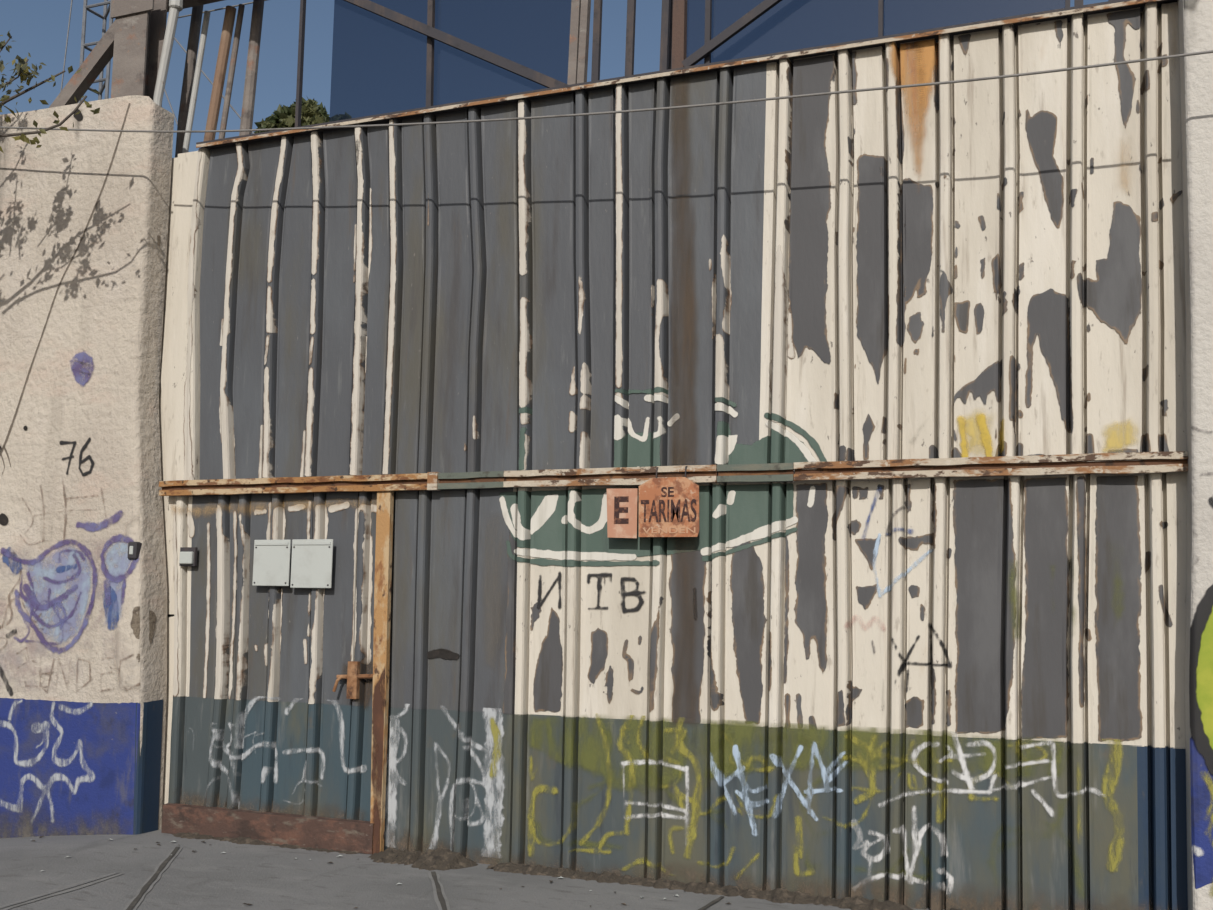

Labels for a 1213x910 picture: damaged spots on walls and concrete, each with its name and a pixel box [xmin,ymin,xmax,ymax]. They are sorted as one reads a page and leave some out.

peeling [258,136,286,478]
peeling [300,131,322,477]
peeling [350,124,373,475]
peeling [383,119,397,474]
peeling [615,84,623,399]
peeling [769,51,858,422]
rust [891,39,938,146]
peeling [848,58,1183,458]
rust [358,665,385,854]
peeling [588,550,724,724]
peeling [730,483,884,730]
peeling [898,476,1151,742]